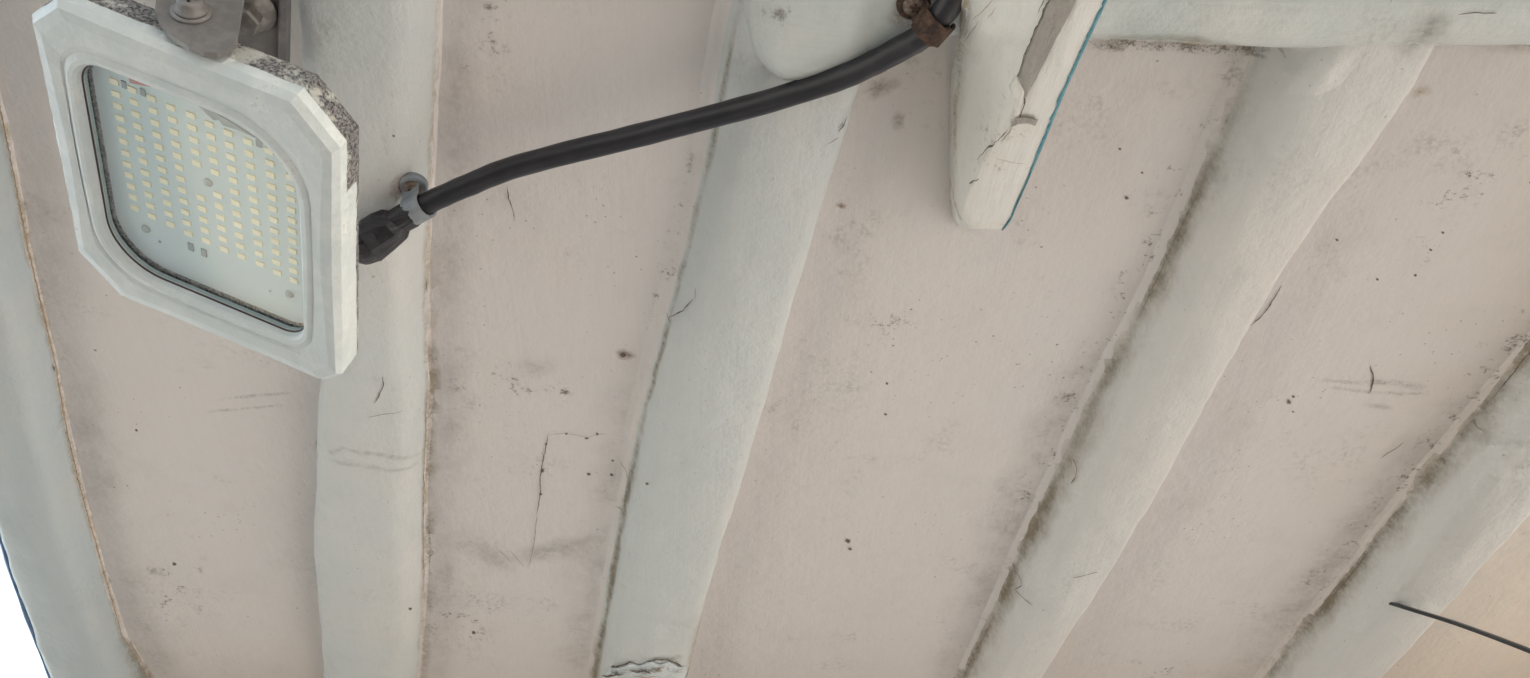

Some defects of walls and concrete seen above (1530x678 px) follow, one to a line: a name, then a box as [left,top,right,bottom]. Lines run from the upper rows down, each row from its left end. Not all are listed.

peeling [602,659,687,678]